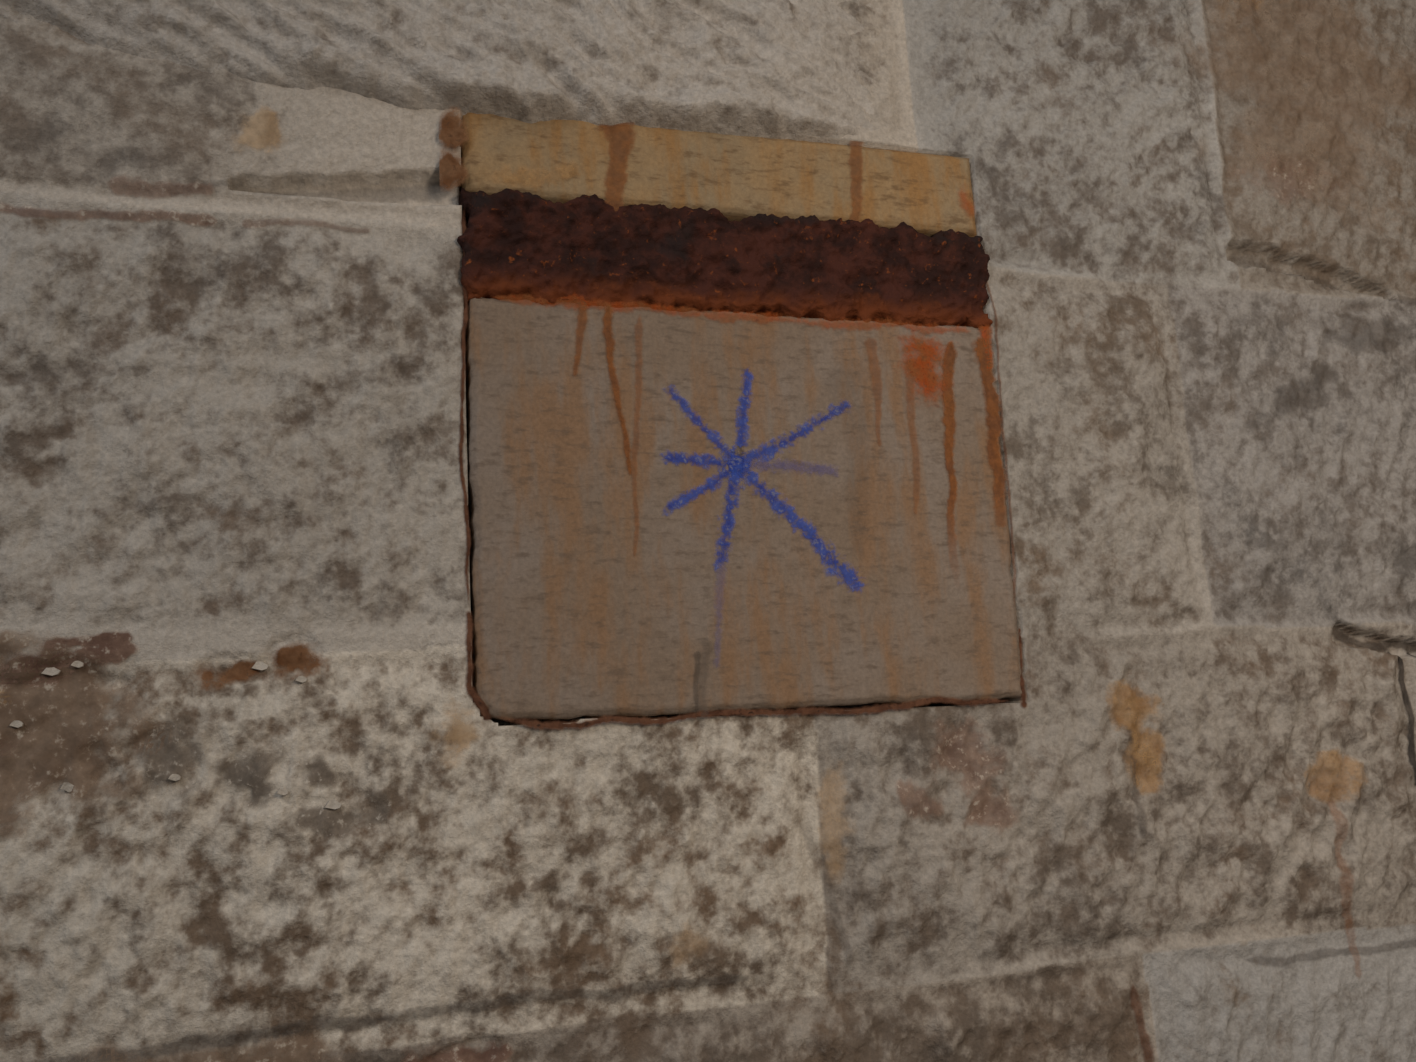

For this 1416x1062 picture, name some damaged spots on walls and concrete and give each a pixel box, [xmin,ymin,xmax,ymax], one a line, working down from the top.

crack [1332,626,1416,781]